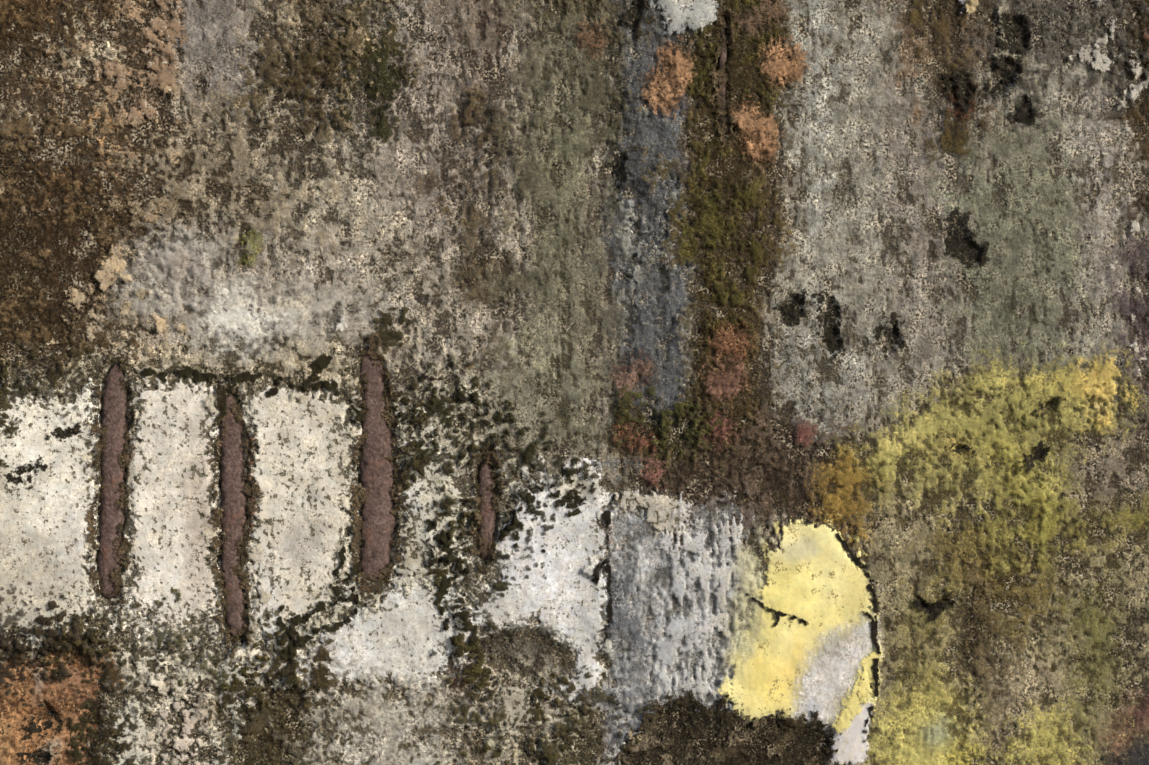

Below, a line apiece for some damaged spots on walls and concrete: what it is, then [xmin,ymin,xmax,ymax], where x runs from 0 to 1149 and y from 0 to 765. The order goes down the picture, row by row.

peeling [60,244,189,356]
rust [359,346,396,583]
peeling [0,330,883,765]
rust [476,459,496,560]
crack [493,484,616,651]
crack [746,593,809,627]
crack [836,533,884,743]